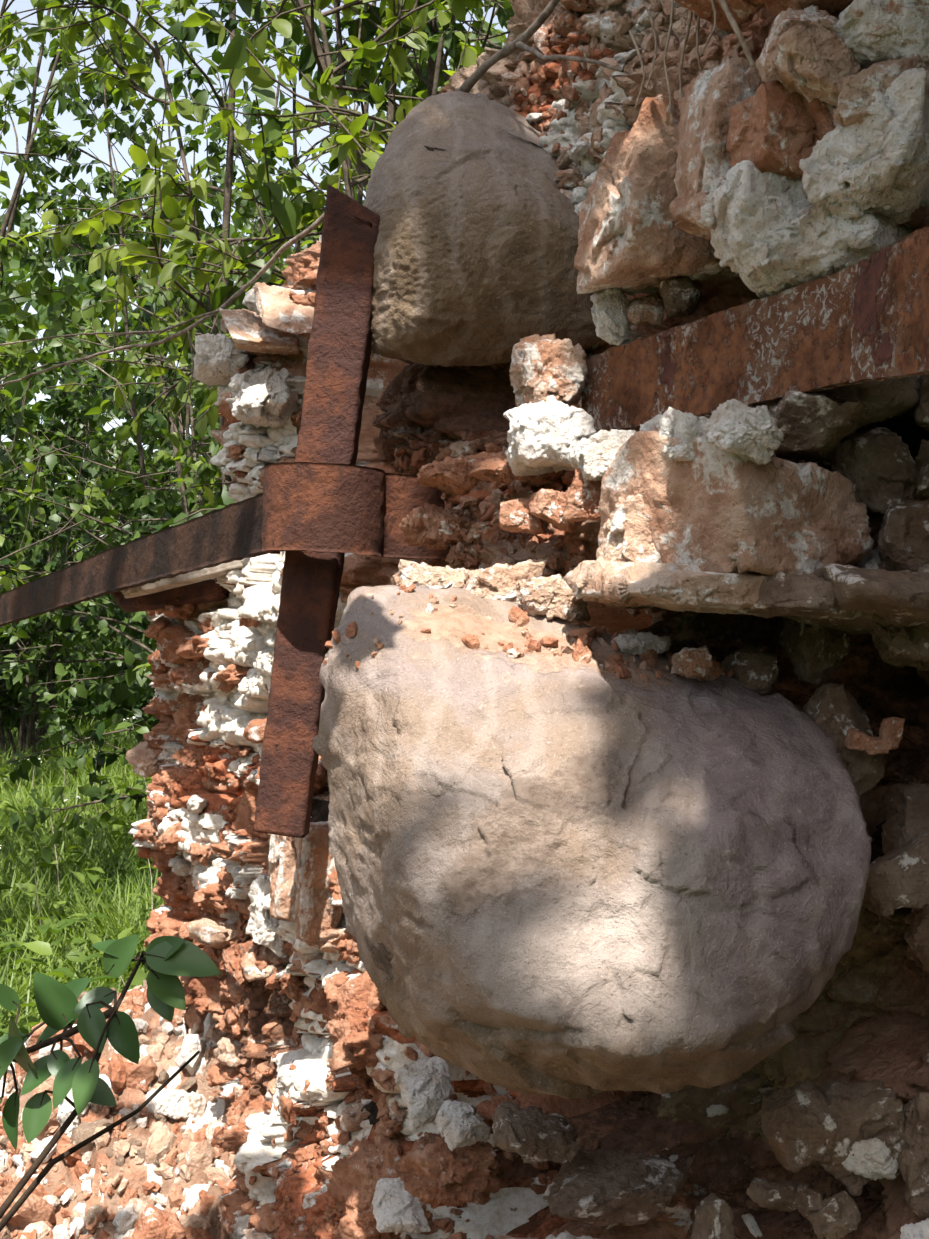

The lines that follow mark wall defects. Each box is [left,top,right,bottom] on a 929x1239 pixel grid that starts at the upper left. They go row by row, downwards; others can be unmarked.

corrosion [589,226,929,429]